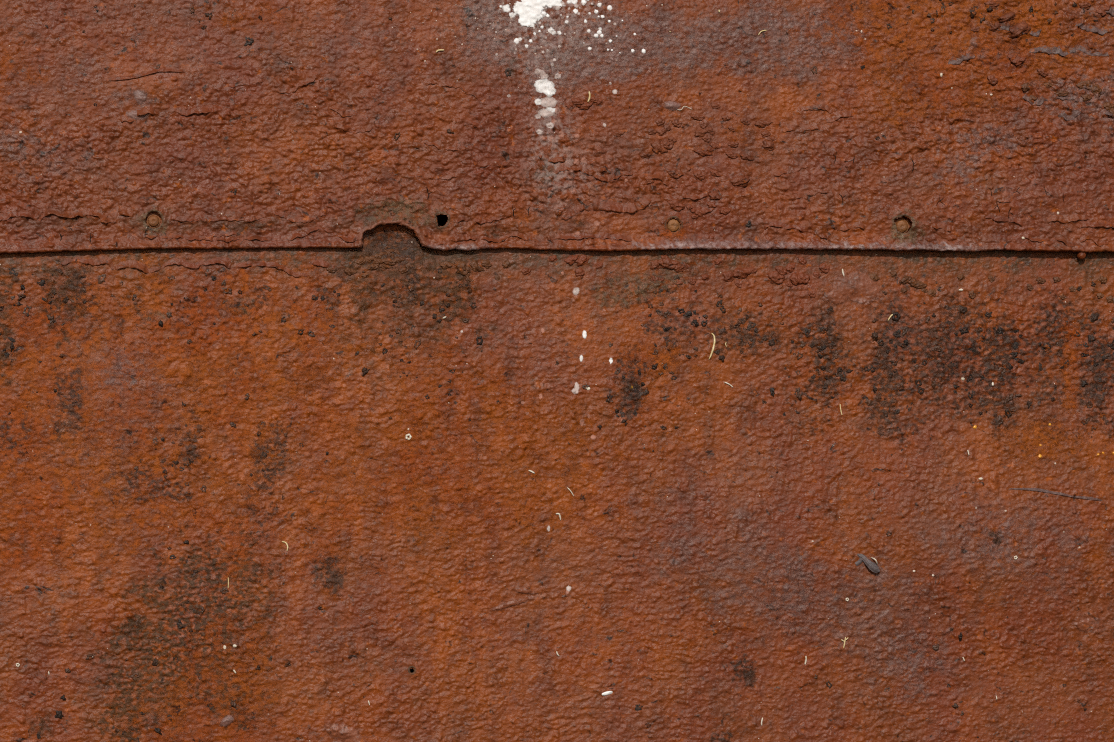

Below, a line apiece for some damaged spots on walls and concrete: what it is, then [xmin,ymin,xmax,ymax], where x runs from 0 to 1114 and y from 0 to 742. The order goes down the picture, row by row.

corrosion [566,96,604,110]
water stain [467,0,860,85]
corrosion [640,103,777,161]
corrosion [823,0,1114,125]
corrosion [549,254,603,279]
corrosion [636,254,830,303]
spalling [614,274,784,395]
spalling [783,292,1025,432]
corrosion [791,271,1114,459]
spalling [606,395,646,427]
corrosion [93,425,286,742]
corrosion [299,548,346,597]